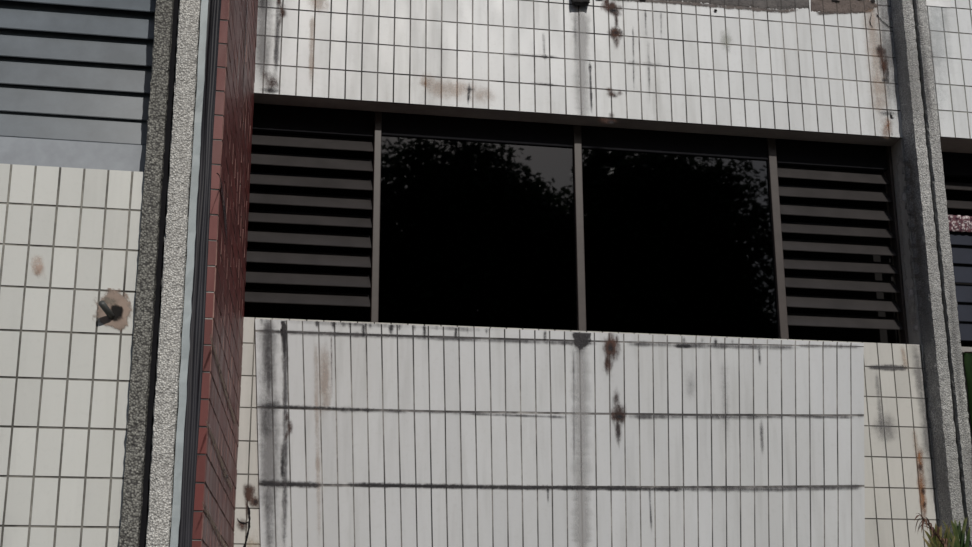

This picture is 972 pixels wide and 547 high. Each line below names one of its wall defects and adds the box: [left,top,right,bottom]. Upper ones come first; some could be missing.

corrosion [603,0,622,45]
spalling [618,0,878,14]
corrosion [877,46,888,81]
corrosion [605,336,618,370]
water stain [676,339,785,360]
water stain [260,321,477,519]
corrosion [612,394,625,436]
corrosion [917,451,926,514]